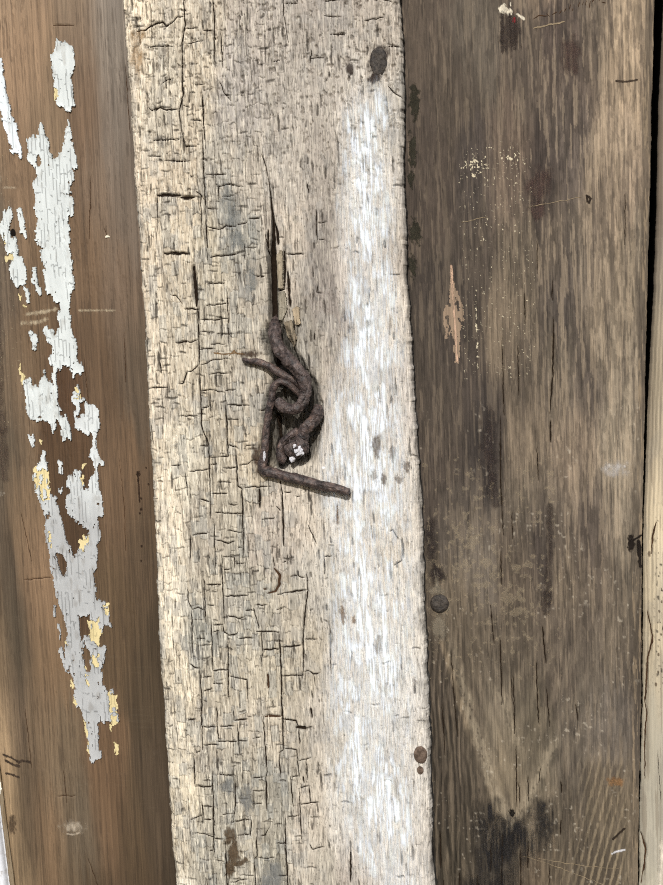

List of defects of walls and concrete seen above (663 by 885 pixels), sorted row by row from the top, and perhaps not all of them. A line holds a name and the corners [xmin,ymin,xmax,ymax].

peeling [0,38,120,763]
crack [125,1,331,885]
corrosion [252,447,272,473]